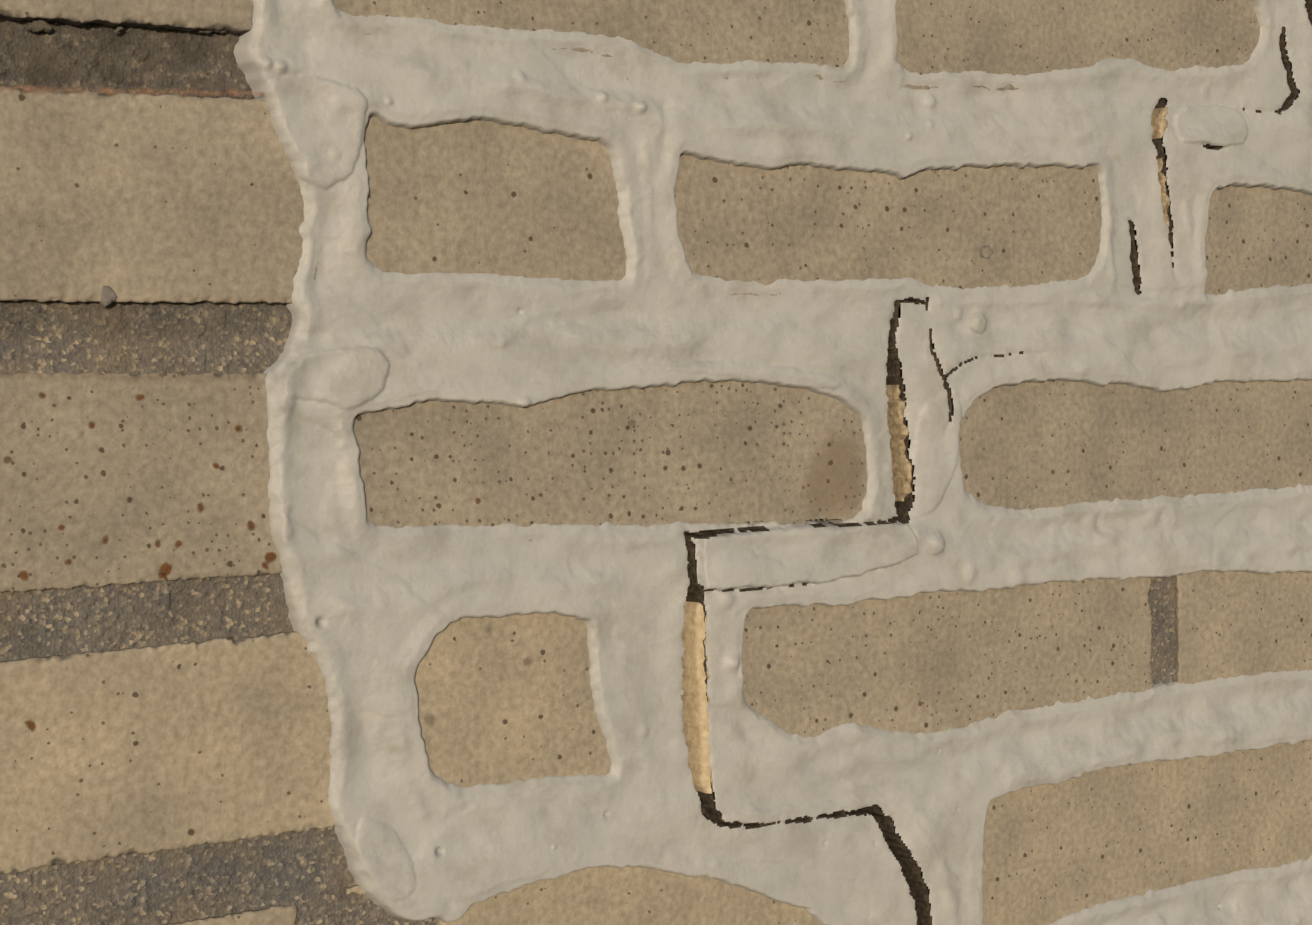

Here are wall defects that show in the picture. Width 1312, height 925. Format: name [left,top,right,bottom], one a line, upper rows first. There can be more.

crack [1242,0,1312,114]
crack [1128,220,1141,295]
crack [1151,98,1173,268]
crack [1203,143,1223,151]
crack [809,297,1024,528]
crack [681,526,932,925]